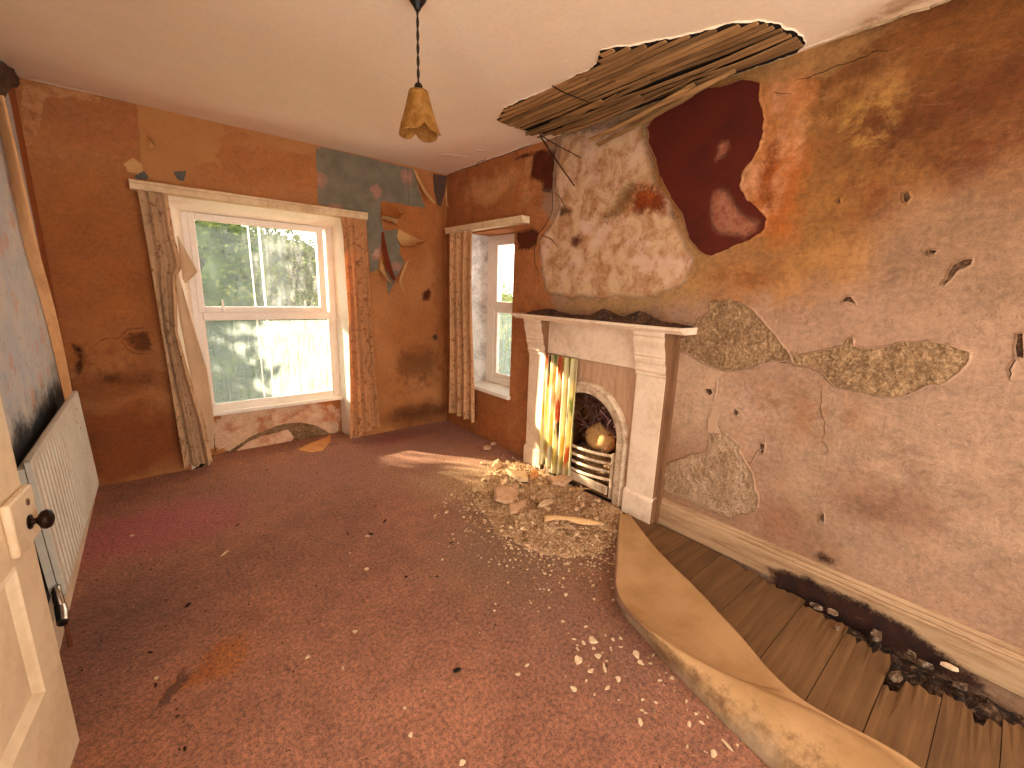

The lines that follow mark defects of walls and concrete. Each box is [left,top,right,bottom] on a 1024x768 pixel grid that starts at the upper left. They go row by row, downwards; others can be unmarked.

peeling [539,77,769,299]
spalling [939,257,975,287]
spalling [840,295,857,306]
leakage [126,331,151,350]
spalling [679,298,973,398]
spalling [1012,331,1024,361]
spalling [212,419,331,455]
spalling [663,387,760,520]
leakage [769,568,985,694]